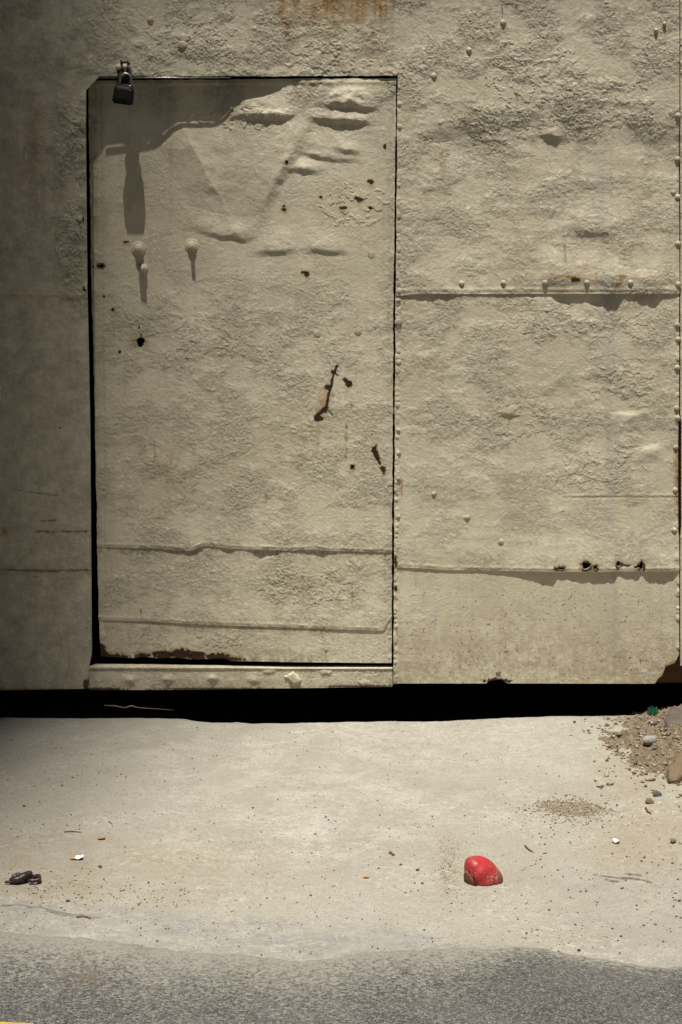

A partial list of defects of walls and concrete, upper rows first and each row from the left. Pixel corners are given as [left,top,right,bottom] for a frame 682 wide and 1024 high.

rust [314,365,352,421]
rust [372,444,386,474]
rust [100,643,246,661]